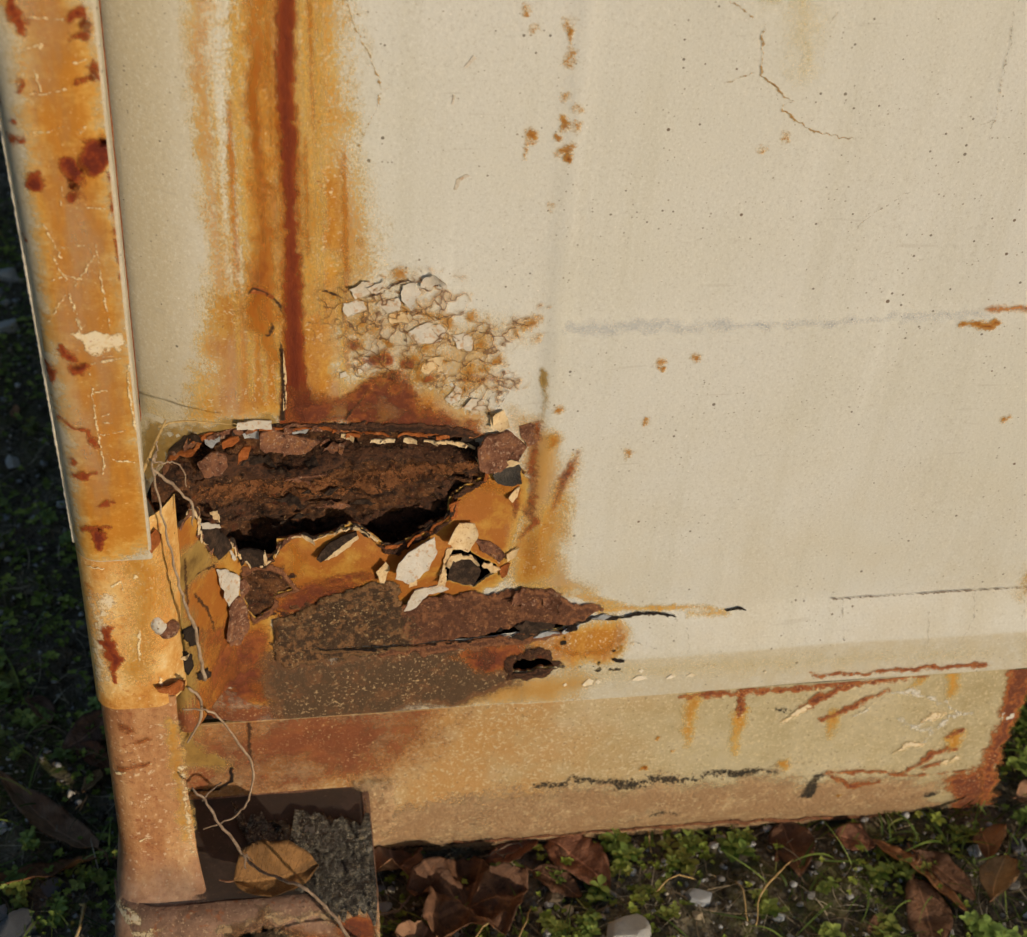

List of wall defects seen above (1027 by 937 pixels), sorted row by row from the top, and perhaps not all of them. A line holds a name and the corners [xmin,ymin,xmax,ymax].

crack [734,3,850,139]
rust [958,305,1027,331]
peeling [167,420,321,478]
rust [0,0,726,903]
peeling [200,511,267,647]
peeling [316,530,359,563]
peeling [376,499,519,612]
crack [566,612,676,628]
crack [833,587,1025,612]
rust [678,662,987,756]
rust [825,669,1027,809]
rust [337,914,380,937]